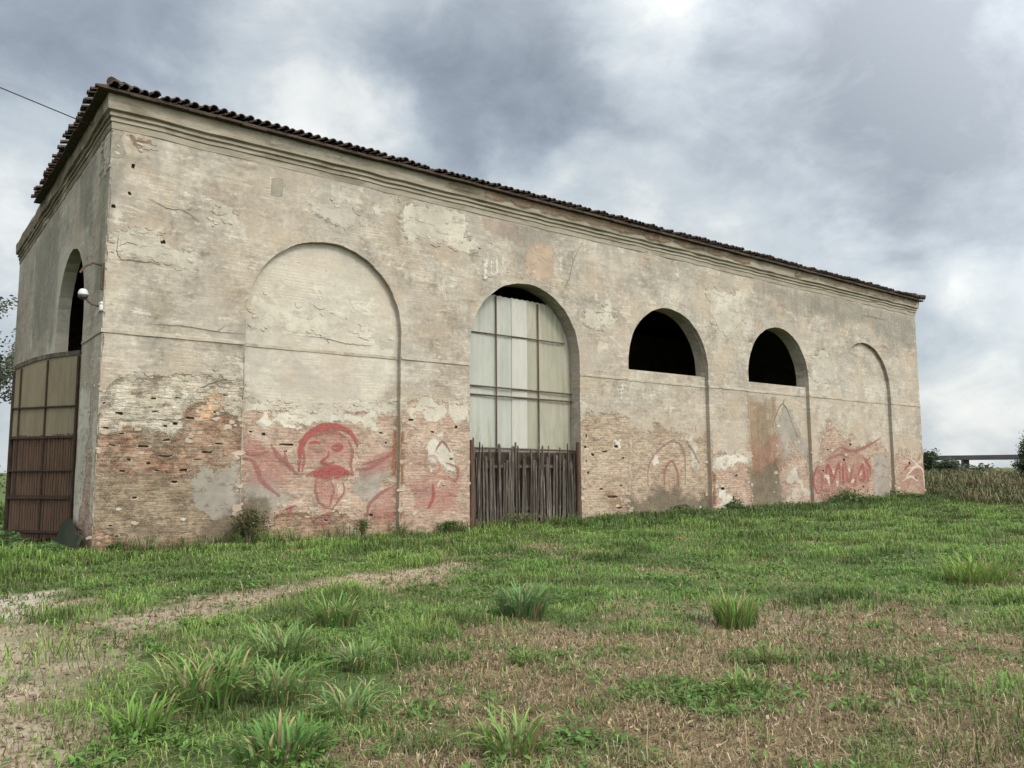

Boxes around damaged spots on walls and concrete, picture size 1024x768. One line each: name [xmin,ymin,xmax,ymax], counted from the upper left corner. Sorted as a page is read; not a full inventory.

peeling [396,196,554,281]
flaking render [73,366,471,553]
peeling [580,408,754,518]
leakage [748,397,782,508]
flaking render [794,418,926,503]